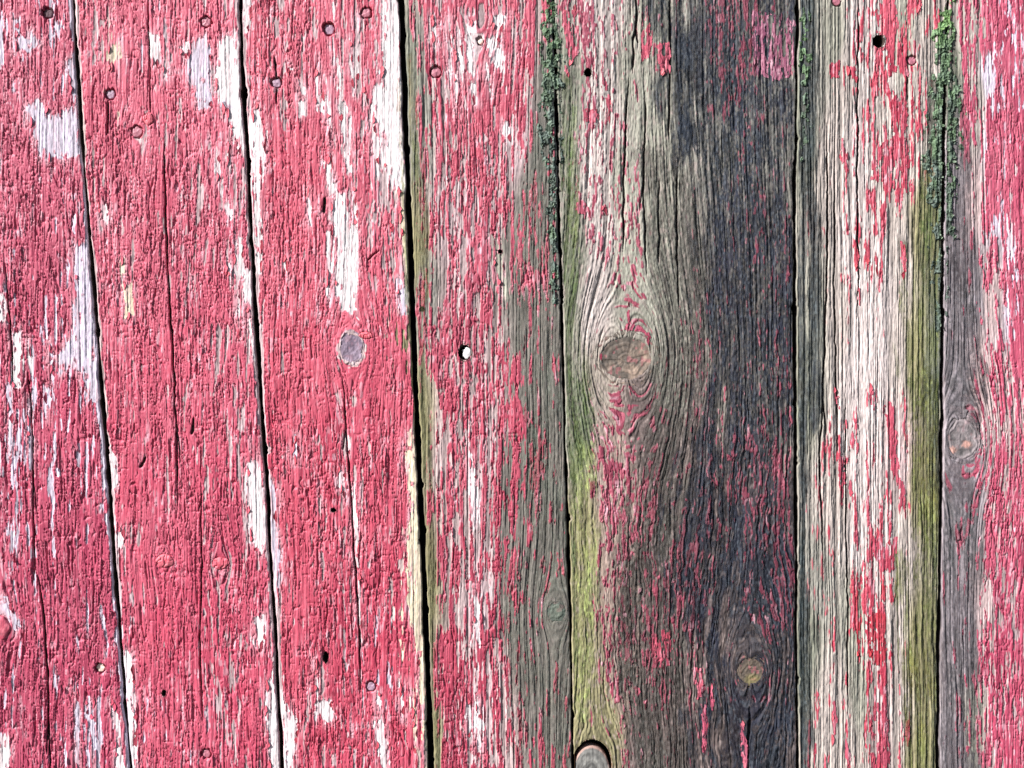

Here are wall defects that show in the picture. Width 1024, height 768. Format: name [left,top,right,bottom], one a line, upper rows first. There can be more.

peeling [26,58,80,161]
peeling [179,0,268,360]
peeling [287,0,409,320]
peeling [0,293,32,456]
peeling [43,238,99,418]
crack [164,150,203,715]
peeling [244,459,280,591]
crack [343,384,361,684]
peeling [399,428,427,768]
peeling [854,524,898,666]
peeling [109,650,138,768]
peeling [264,671,300,768]